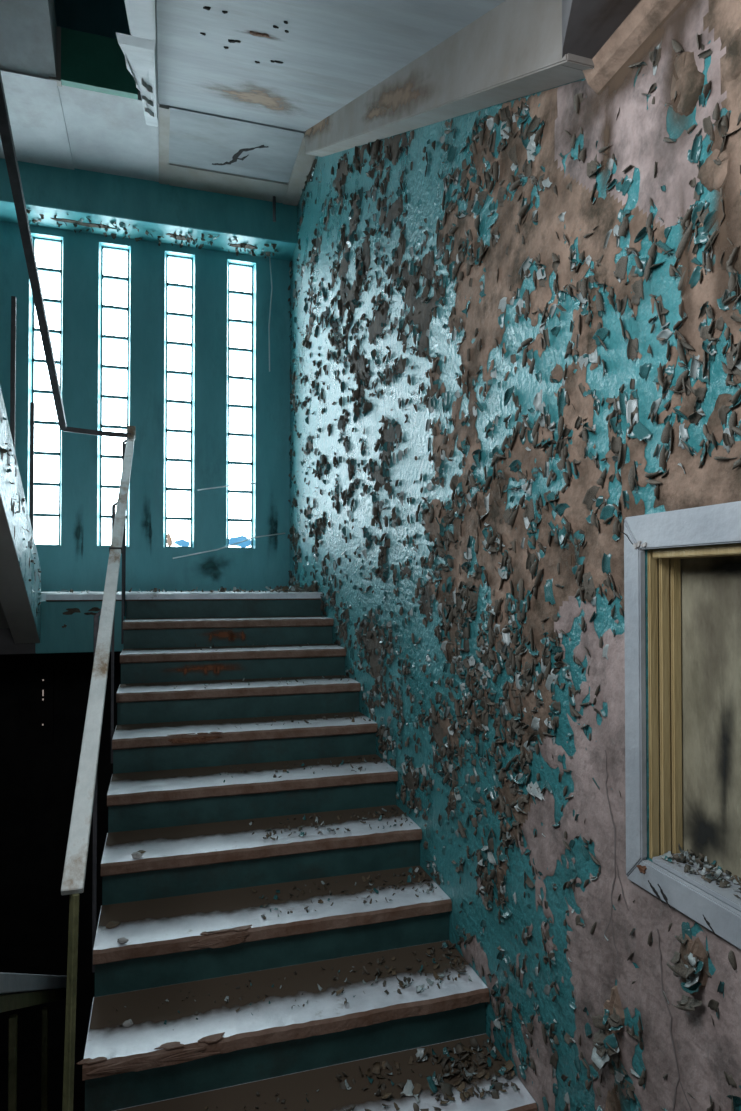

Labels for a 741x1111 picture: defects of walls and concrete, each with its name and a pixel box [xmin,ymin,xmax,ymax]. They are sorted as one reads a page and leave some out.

crack [212,145,268,165]
leakage [221,89,289,111]
flaking render [0,443,41,617]
peeling [287,0,741,1111]